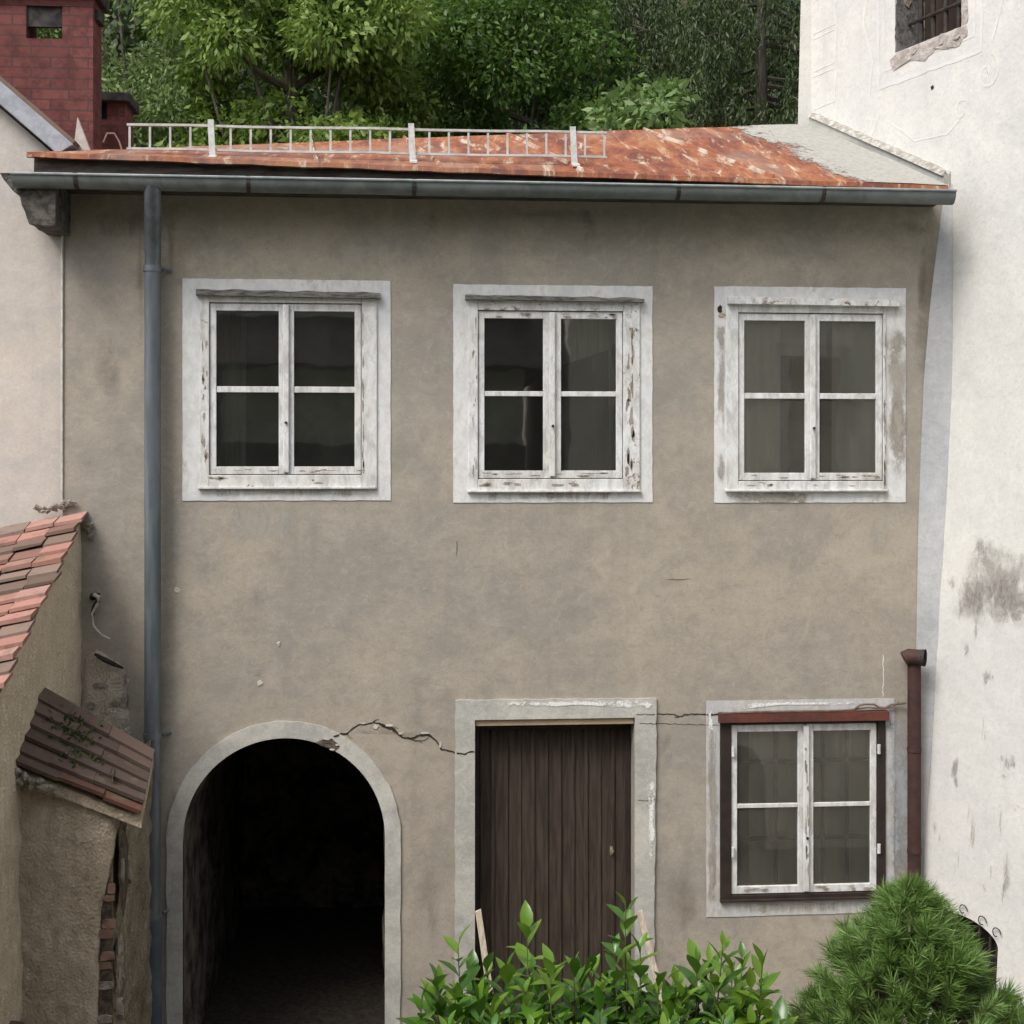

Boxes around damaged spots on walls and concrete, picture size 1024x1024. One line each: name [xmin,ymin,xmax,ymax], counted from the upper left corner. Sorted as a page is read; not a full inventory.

peeling [625,330,635,477]
leakage [951,543,1024,654]
flaking render [316,738,340,752]
crack [334,719,474,755]
crack [636,713,718,726]
flaking render [97,822,132,1024]